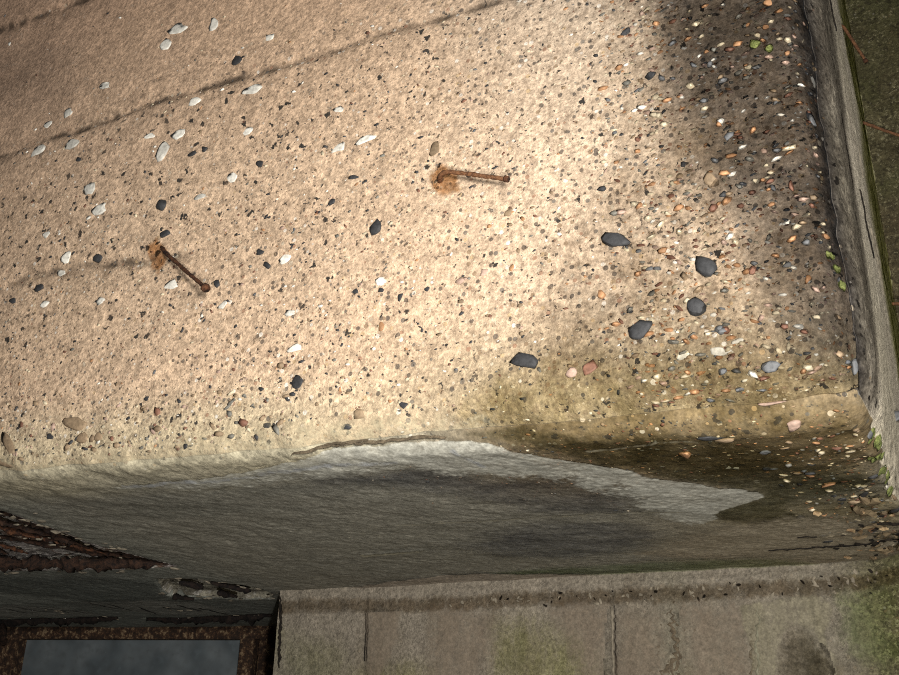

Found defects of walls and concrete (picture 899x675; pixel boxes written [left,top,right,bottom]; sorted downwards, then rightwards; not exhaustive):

spalling [158,12,188,50]
spalling [208,16,231,31]
spalling [210,47,267,113]
spalling [0,68,485,468]
spalling [395,0,899,597]
water stain [115,421,898,562]
spalling [0,510,275,602]
corrosion [0,616,119,627]
corrosion [146,614,272,627]
water stain [683,596,842,675]